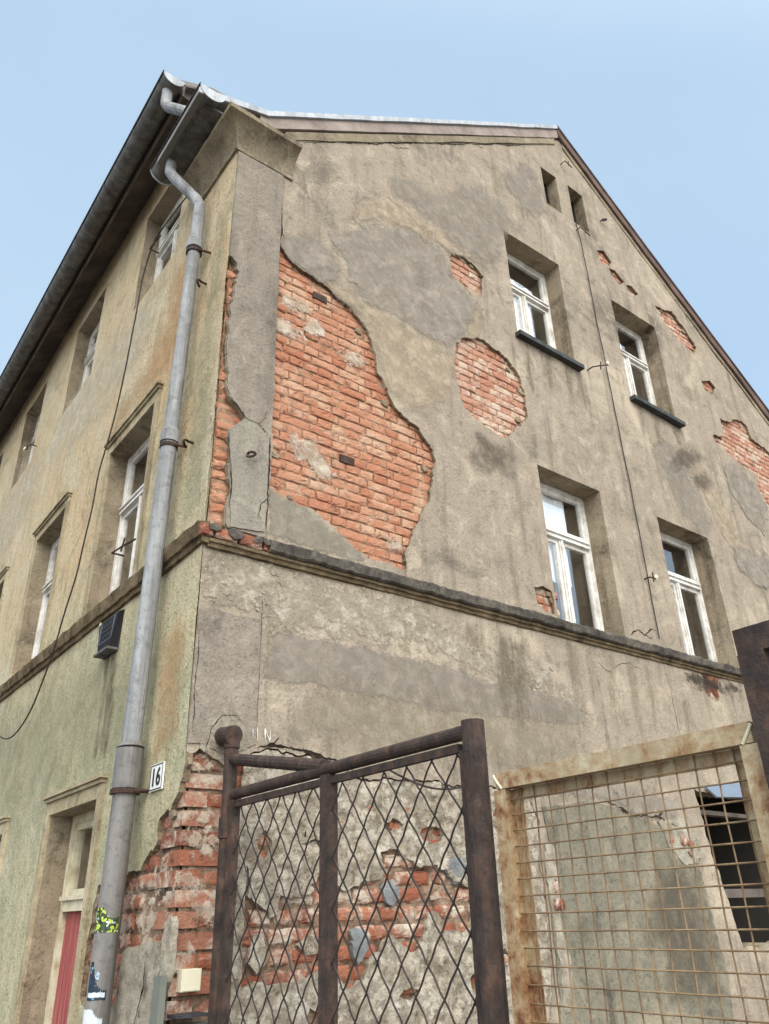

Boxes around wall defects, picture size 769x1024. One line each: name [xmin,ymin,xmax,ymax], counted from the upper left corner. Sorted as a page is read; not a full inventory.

spalling [269,195,528,570]
spalling [597,250,638,297]
spalling [656,306,696,354]
peeling [196,256,571,698]
spalling [713,418,769,505]
crack [193,594,353,770]
rust [703,674,720,699]
crack [608,793,676,826]
spalling [80,885,101,1007]
spalling [111,734,224,1024]
spalling [235,862,319,988]
spalling [338,849,470,988]